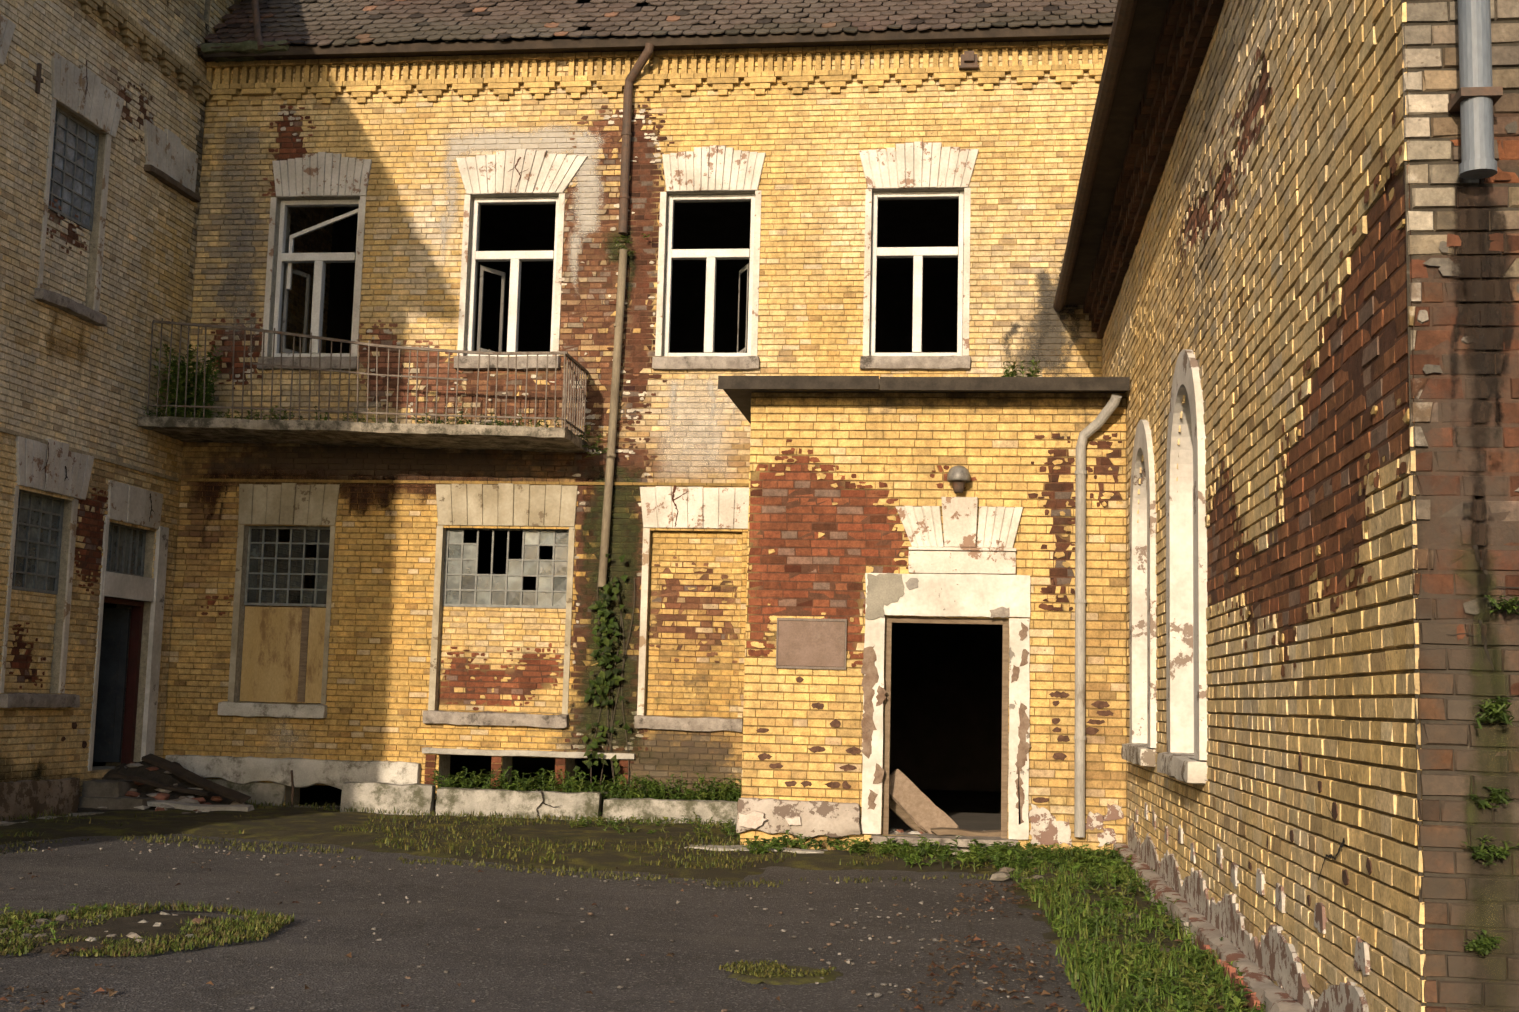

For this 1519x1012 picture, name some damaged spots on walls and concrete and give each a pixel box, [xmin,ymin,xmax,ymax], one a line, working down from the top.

spalling [262,105,316,196]
spalling [9,622,46,688]
spalling [74,488,108,594]
peeling [354,98,919,810]
peeling [990,606,1029,683]
spalling [1028,433,1123,611]
spalling [1049,691,1114,760]
spalling [1205,145,1519,677]
damp [1451,176,1516,1012]
peeling [1015,703,1371,1012]